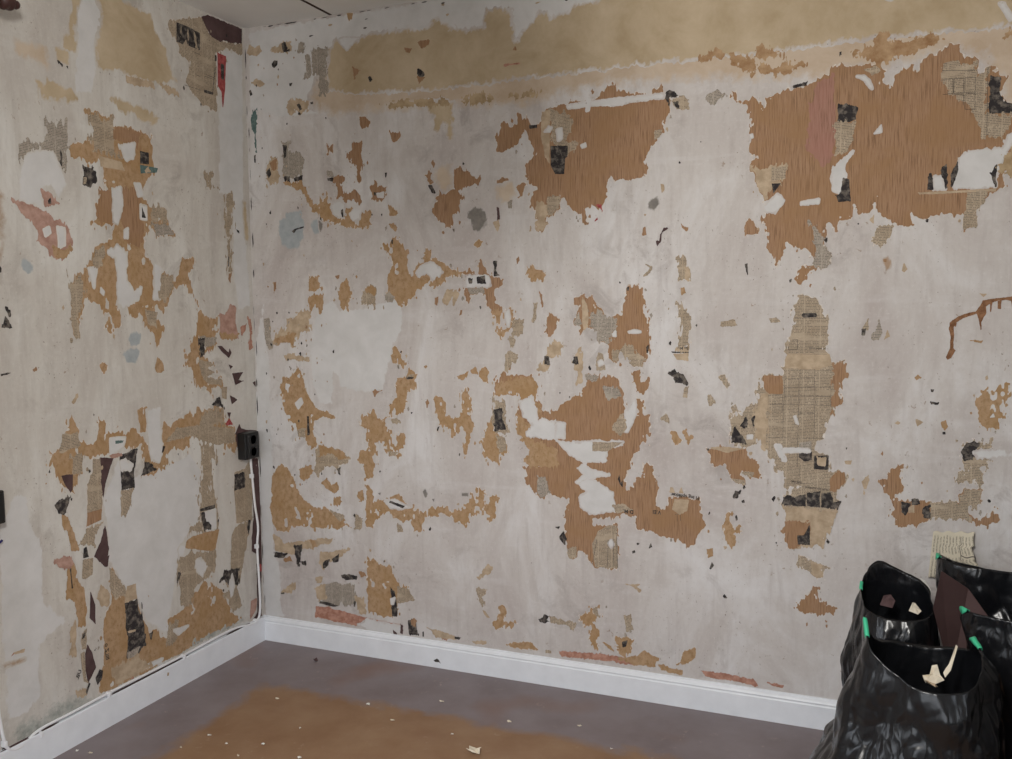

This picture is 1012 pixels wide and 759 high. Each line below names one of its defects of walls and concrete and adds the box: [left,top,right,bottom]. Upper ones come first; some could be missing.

peeling [493,82,672,233]
peeling [726,42,1012,296]
peeling [11,107,199,373]
peeling [45,393,238,501]
peeling [75,567,242,698]
peeling [354,548,415,618]
peeling [265,116,743,571]
peeling [705,339,832,489]
peeling [776,497,838,550]
peeling [852,463,1001,529]
peeling [970,375,1012,442]